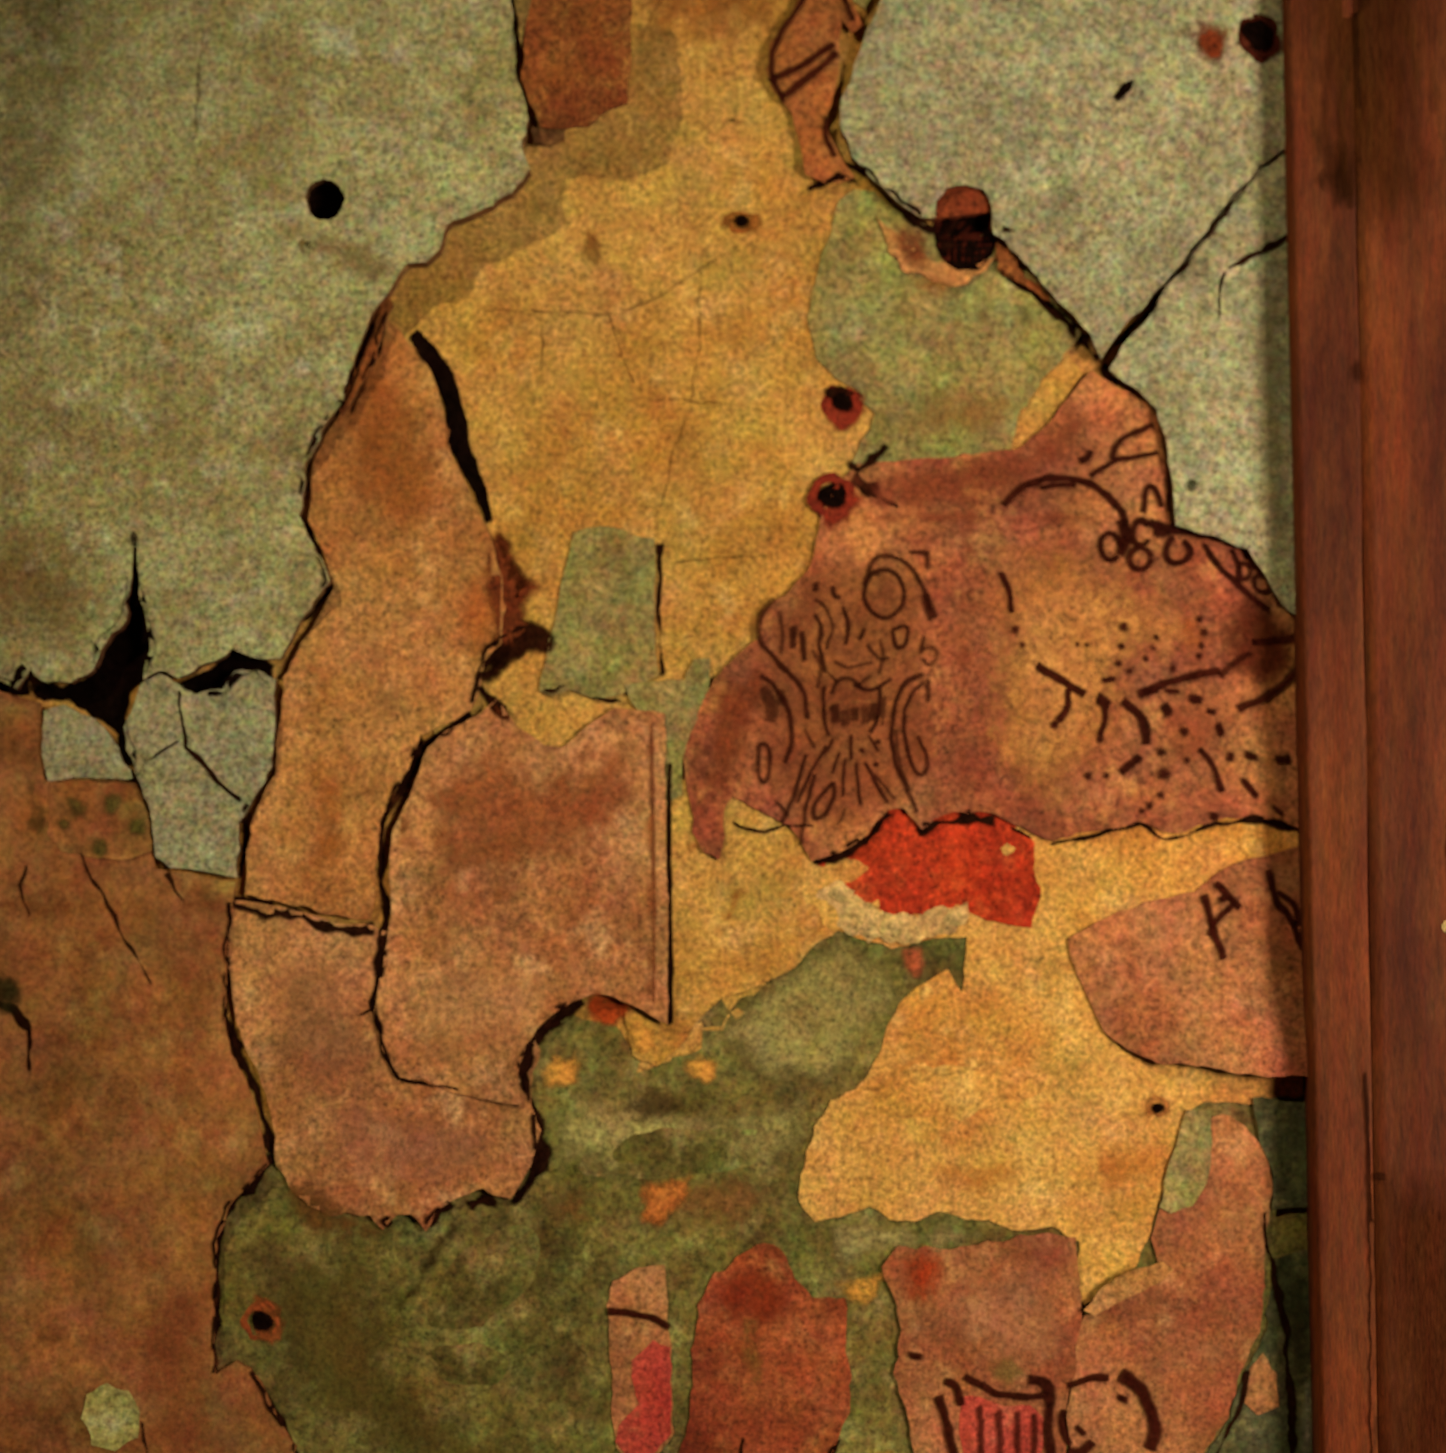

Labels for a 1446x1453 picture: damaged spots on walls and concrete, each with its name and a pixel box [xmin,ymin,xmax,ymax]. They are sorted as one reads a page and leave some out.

rust [1198,14,1282,60]
crack [807,162,957,251]
crack [1001,169,1289,385]
crack [300,308,492,621]
peeling [0,0,1295,878]
rust [817,482,861,526]
rust [823,388,864,431]
crack [656,543,665,675]
crack [0,531,508,1453]
peeling [215,658,1312,1453]
rust [253,1297,284,1343]
peeling [81,1383,140,1451]